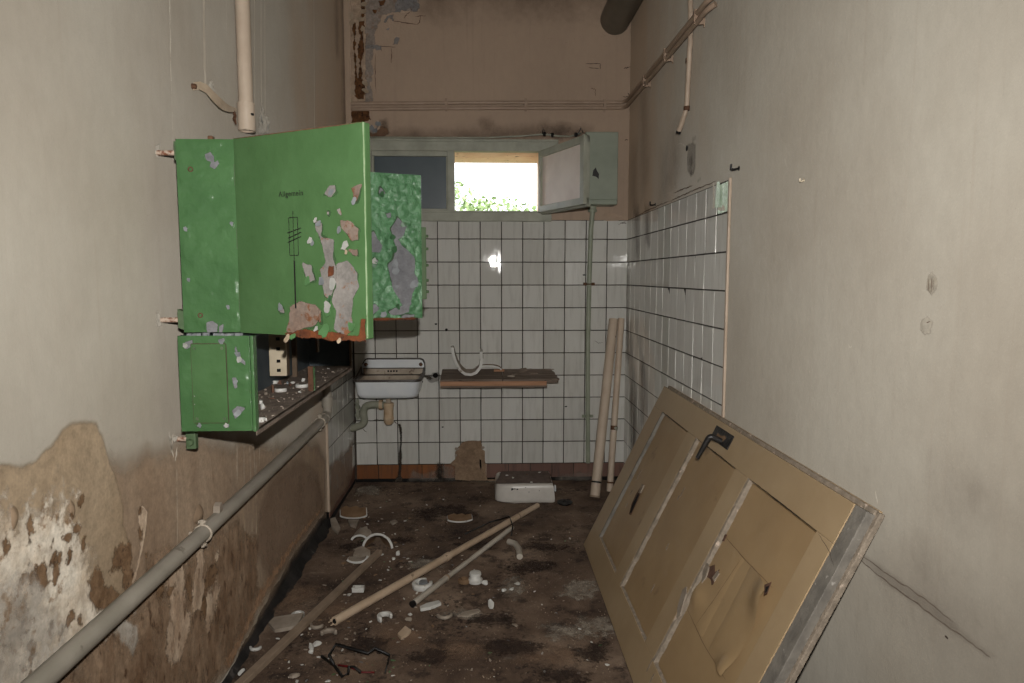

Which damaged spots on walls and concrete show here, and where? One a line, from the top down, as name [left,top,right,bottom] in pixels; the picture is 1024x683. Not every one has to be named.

peeling [365,0,419,102]
flaking render [0,492,143,683]
leakage [0,423,353,683]
crack [861,557,990,657]